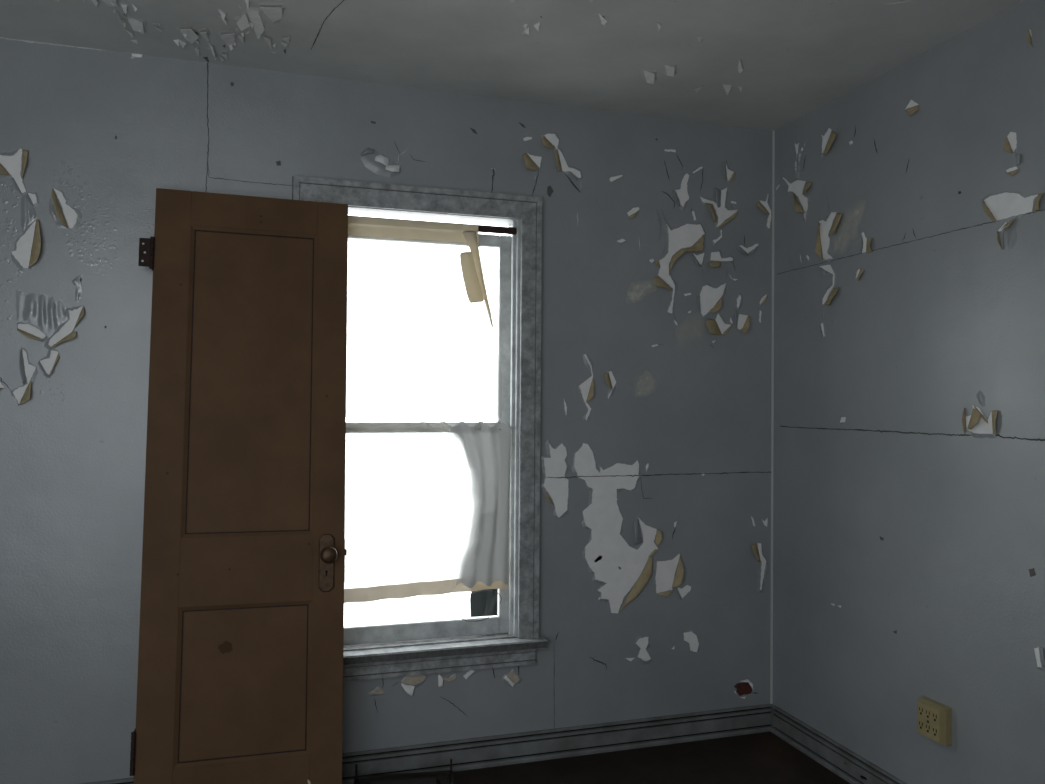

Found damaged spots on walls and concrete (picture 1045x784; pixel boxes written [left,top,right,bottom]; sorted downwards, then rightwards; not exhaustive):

peeling [173,0,292,63]
peeling [11,219,41,272]
peeling [0,148,82,231]
peeling [520,123,583,193]
peeling [649,158,768,348]
peeling [757,138,842,339]
peeling [1004,131,1021,176]
peeling [981,191,1044,251]
peeling [0,305,84,406]
crack [782,426,1045,441]
peeling [541,439,693,614]
peeling [368,670,476,712]